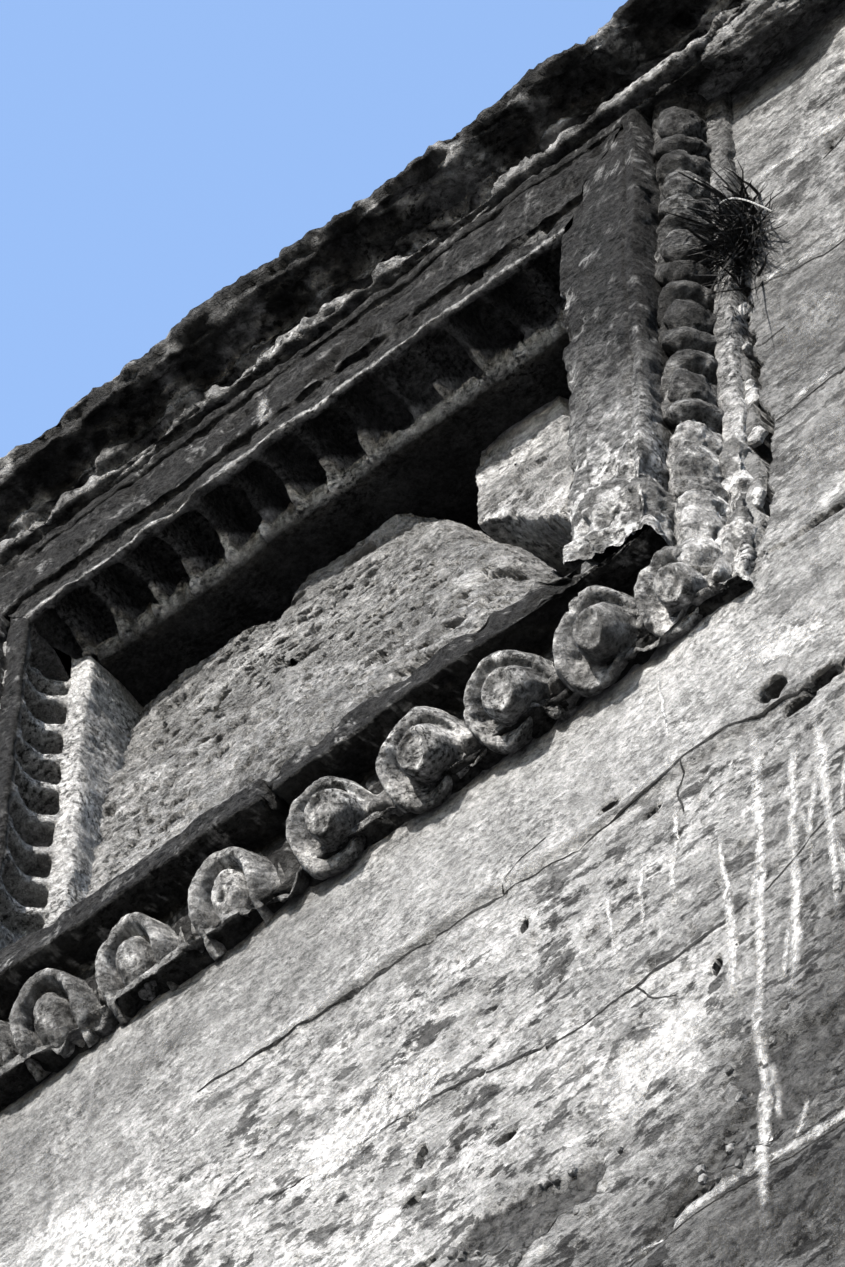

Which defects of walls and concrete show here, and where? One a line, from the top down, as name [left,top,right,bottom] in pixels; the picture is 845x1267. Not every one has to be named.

crack [197,688,817,1092]
crack [359,806,845,1145]
water stain [719,850,739,982]
water stain [748,740,764,984]
water stain [784,729,845,972]
crack [268,1160,330,1201]
water stain [707,1010,845,1267]